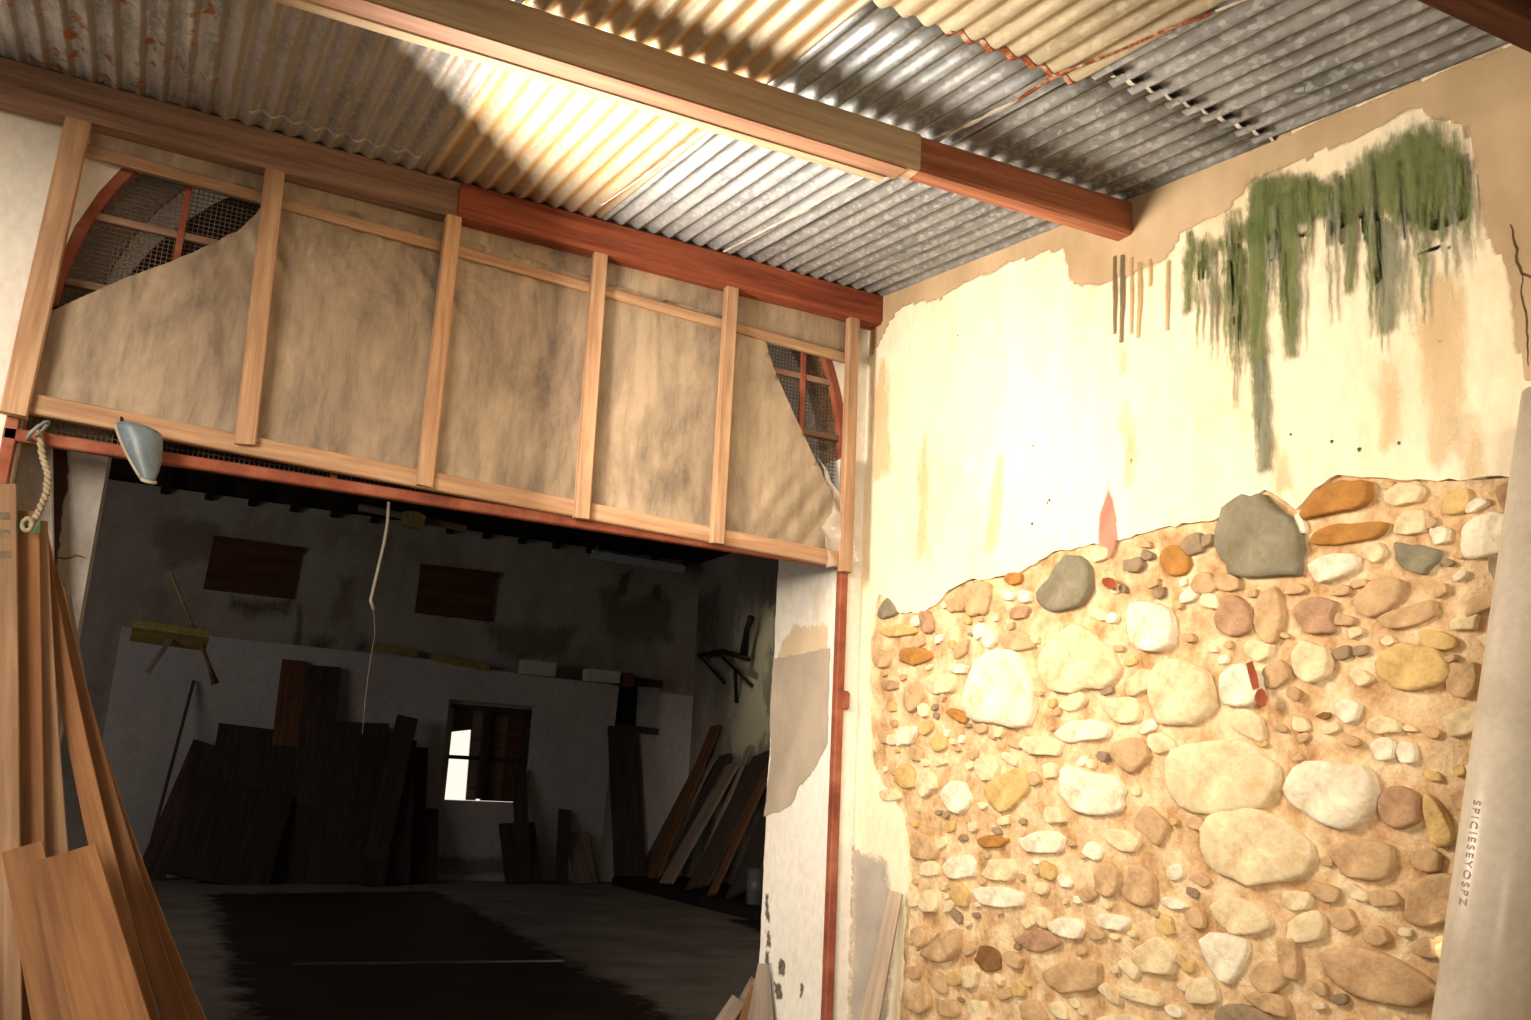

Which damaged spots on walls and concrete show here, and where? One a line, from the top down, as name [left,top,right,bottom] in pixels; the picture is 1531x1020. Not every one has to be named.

corrosion [933,0,1247,142]
corrosion [1111,74,1275,142]
corrosion [723,177,863,252]
peeling [869,45,1531,381]
leakage [1112,255,1170,343]
crack [1510,224,1531,366]
peeling [725,596,830,816]
flaking render [870,476,1509,1020]